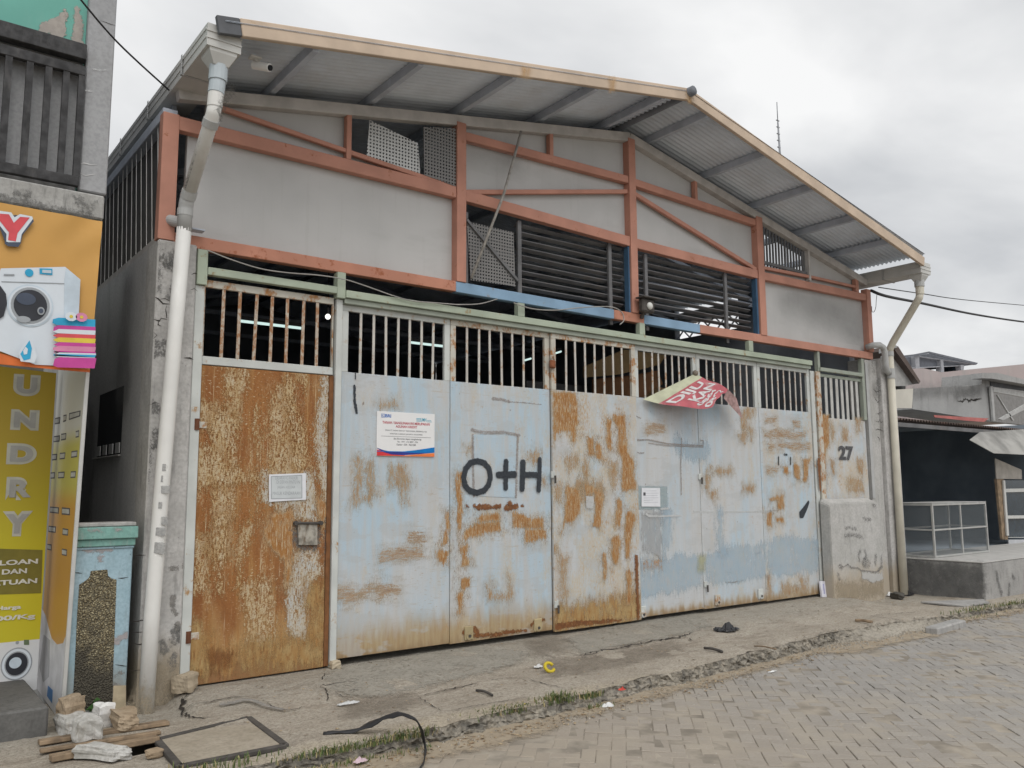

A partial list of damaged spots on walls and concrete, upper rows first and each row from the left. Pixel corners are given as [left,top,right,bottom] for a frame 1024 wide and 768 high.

rust [348,455,411,509]
rust [378,391,666,638]
rust [766,494,785,527]
rust [737,407,865,495]
rust [190,508,402,678]